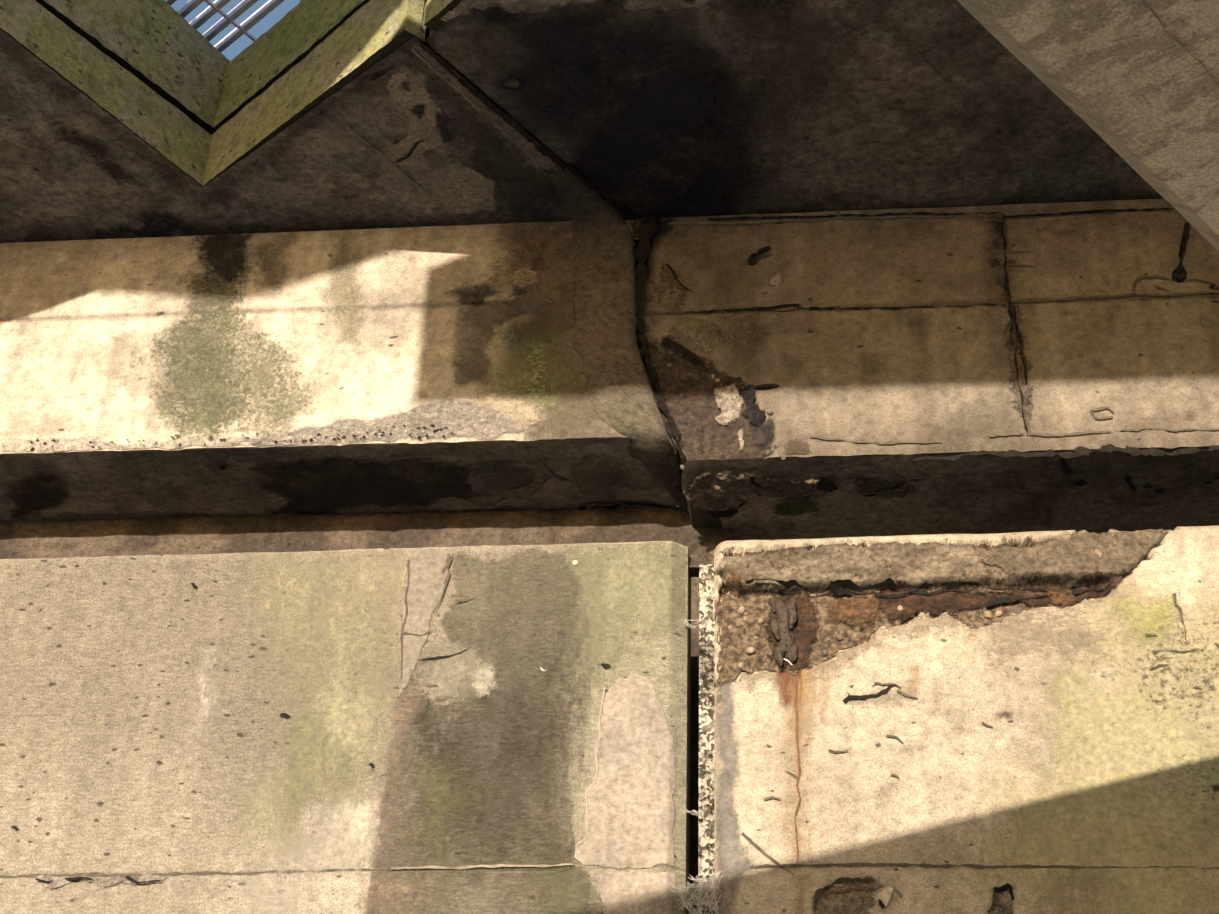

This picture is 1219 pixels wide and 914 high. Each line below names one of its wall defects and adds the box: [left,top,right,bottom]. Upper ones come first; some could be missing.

leakage [475,6,751,218]
leakage [250,237,296,291]
leakage [161,276,254,436]
spalling [641,280,1219,518]
leakage [5,474,67,518]
leakage [252,451,571,515]
spalling [717,529,1170,699]
spalling [812,876,902,914]